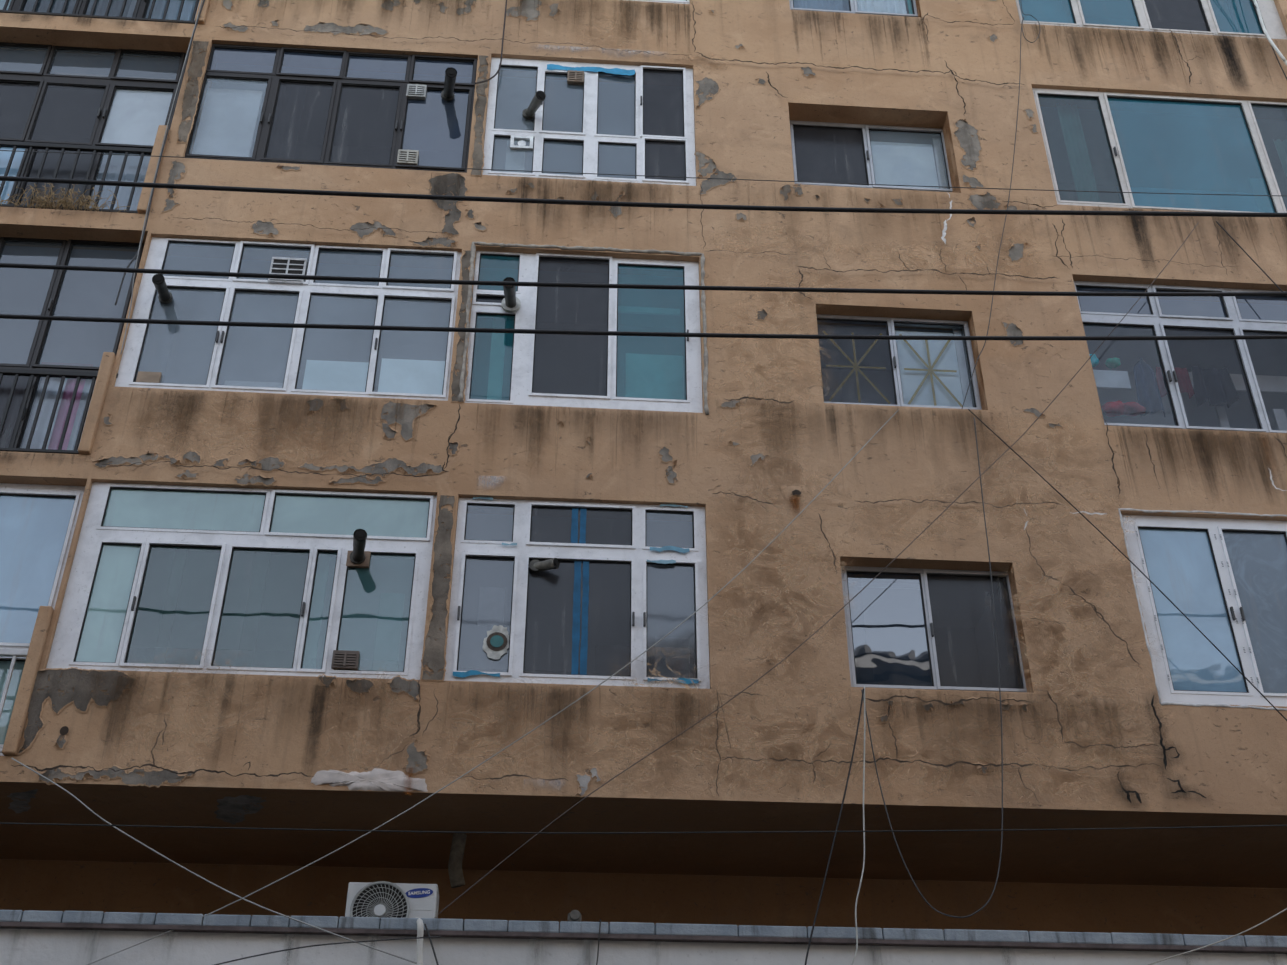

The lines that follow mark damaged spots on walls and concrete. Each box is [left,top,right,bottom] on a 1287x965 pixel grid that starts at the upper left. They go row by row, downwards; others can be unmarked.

damp [1204,35,1242,81]
peeling [176,40,210,144]
peeling [694,77,720,109]
peeling [161,160,187,213]
peeling [694,151,738,195]
peeling [953,119,1018,228]
peeling [349,55,490,442]
peeling [306,397,351,416]
peeling [91,441,459,486]
crack [713,416,1206,803]
peeling [17,667,137,755]
peeling [37,765,196,788]